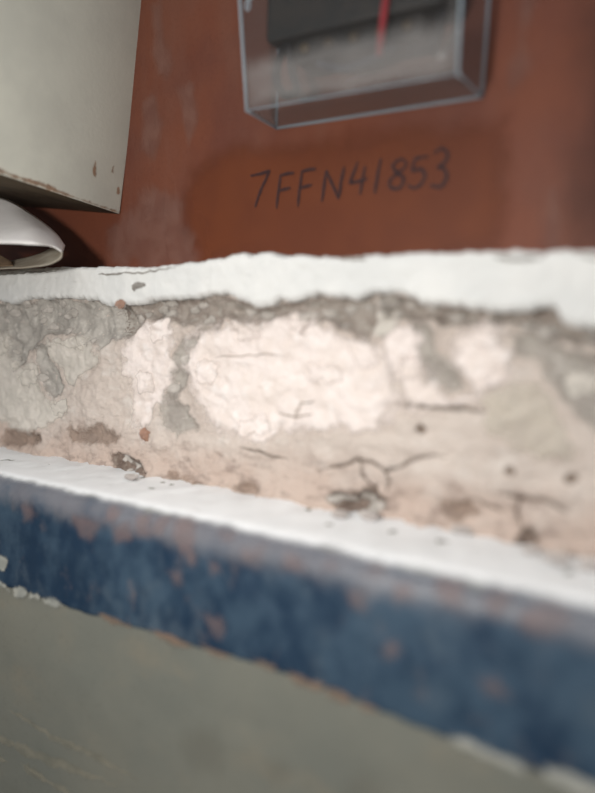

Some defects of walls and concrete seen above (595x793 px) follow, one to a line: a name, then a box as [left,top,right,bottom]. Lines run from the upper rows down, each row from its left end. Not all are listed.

peeling [0,293,595,447]
spalling [112,452,146,475]
spalling [238,483,259,493]
spalling [327,487,386,512]
spalling [442,501,479,519]
spalling [515,527,538,545]
peeling [0,582,60,608]